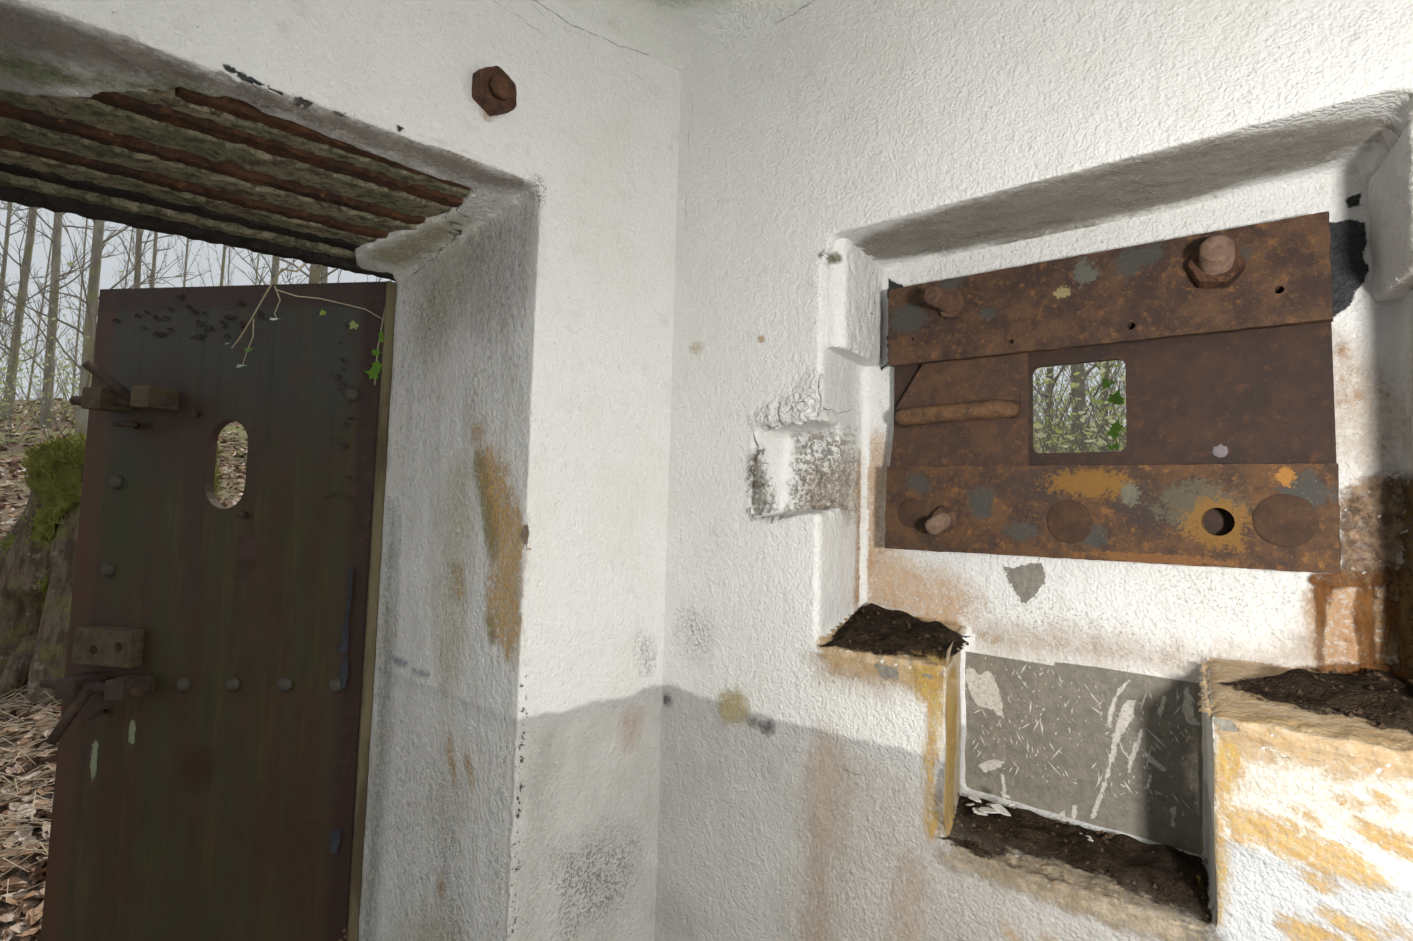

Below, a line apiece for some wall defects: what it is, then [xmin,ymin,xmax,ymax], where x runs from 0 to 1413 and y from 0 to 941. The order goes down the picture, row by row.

crack [520,0,647,78]
flaking render [747,368,849,510]
rust [811,439,1413,941]